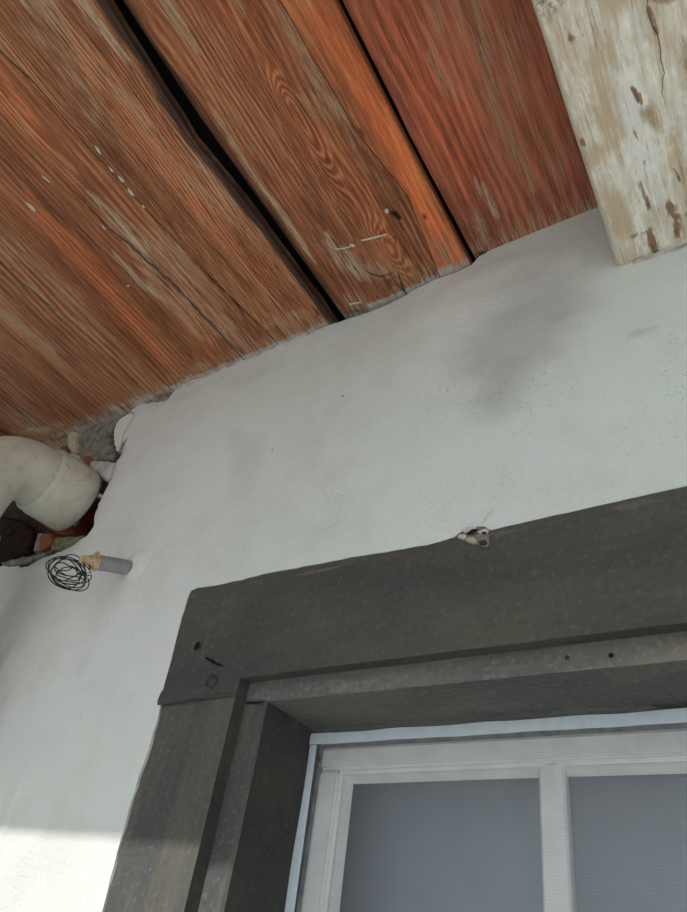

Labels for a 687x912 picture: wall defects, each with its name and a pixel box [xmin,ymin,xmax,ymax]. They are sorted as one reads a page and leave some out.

crack [647,0,665,98]
spalling [0,413,134,568]
spalling [457,527,489,547]